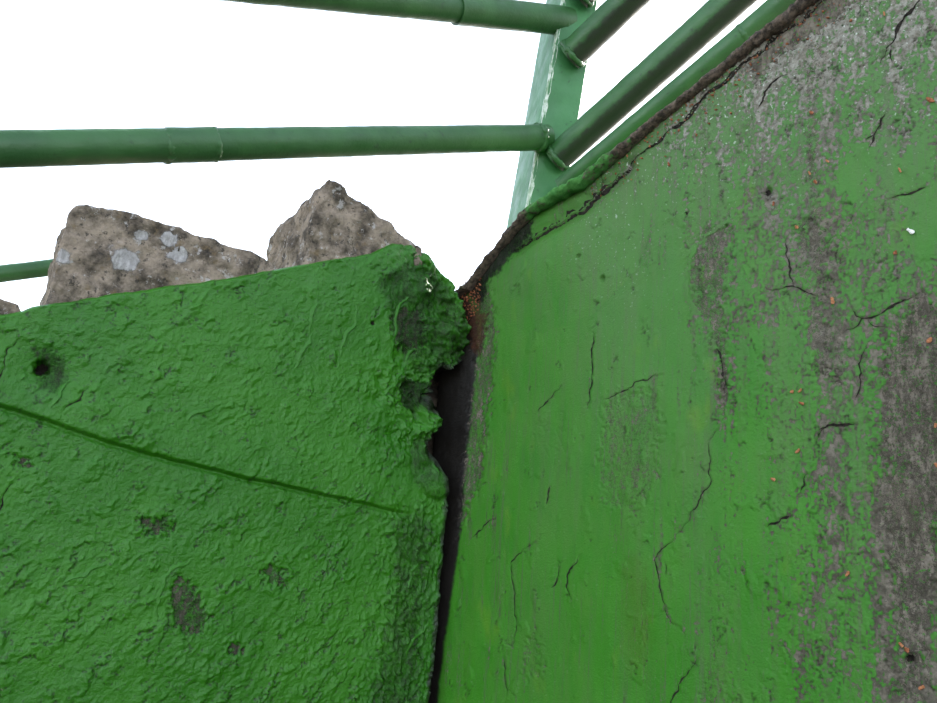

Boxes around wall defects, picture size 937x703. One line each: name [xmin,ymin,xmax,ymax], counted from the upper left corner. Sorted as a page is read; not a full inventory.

peeling [744,0,861,79]
peeling [691,218,733,415]
crack [775,240,819,297]
crack [840,293,918,397]
crack [816,423,853,440]
crack [654,433,715,630]
peeling [876,290,937,703]
crack [670,658,697,703]